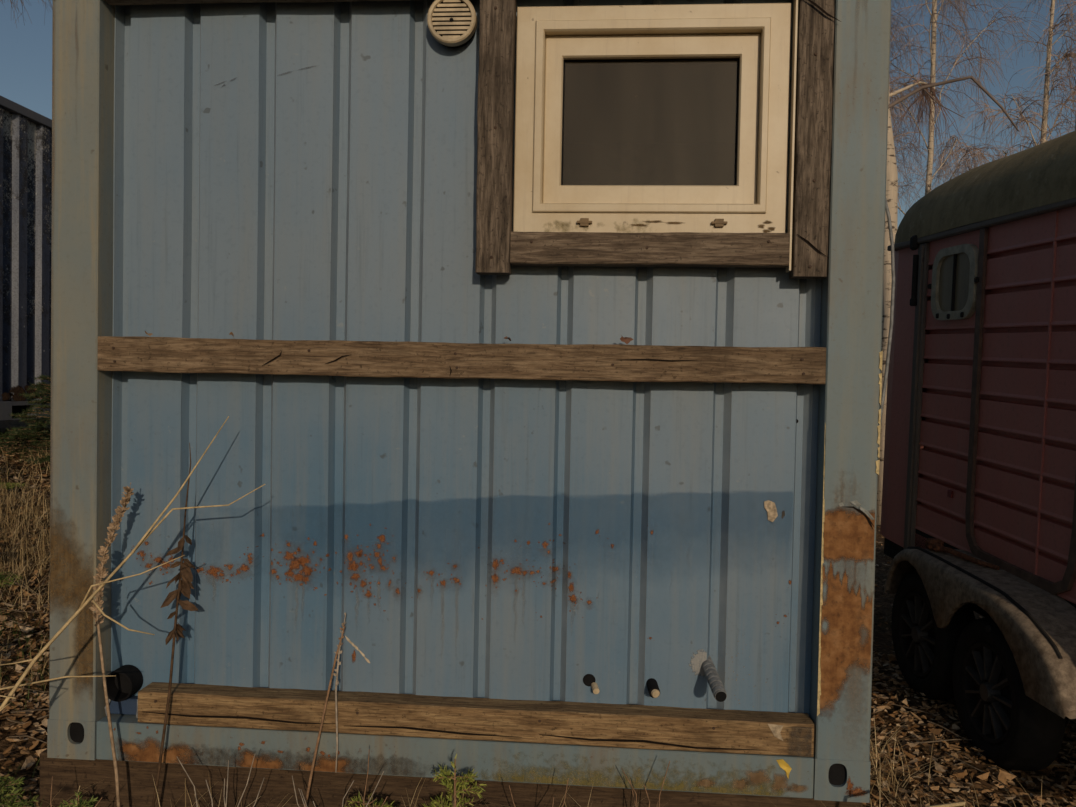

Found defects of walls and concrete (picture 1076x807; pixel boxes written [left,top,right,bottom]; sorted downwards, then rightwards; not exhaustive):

rust [50,524,94,684]
rust [131,528,406,611]
rust [485,534,592,618]
peeling [817,425,826,716]
rust [820,509,875,710]
rust [847,779,867,796]